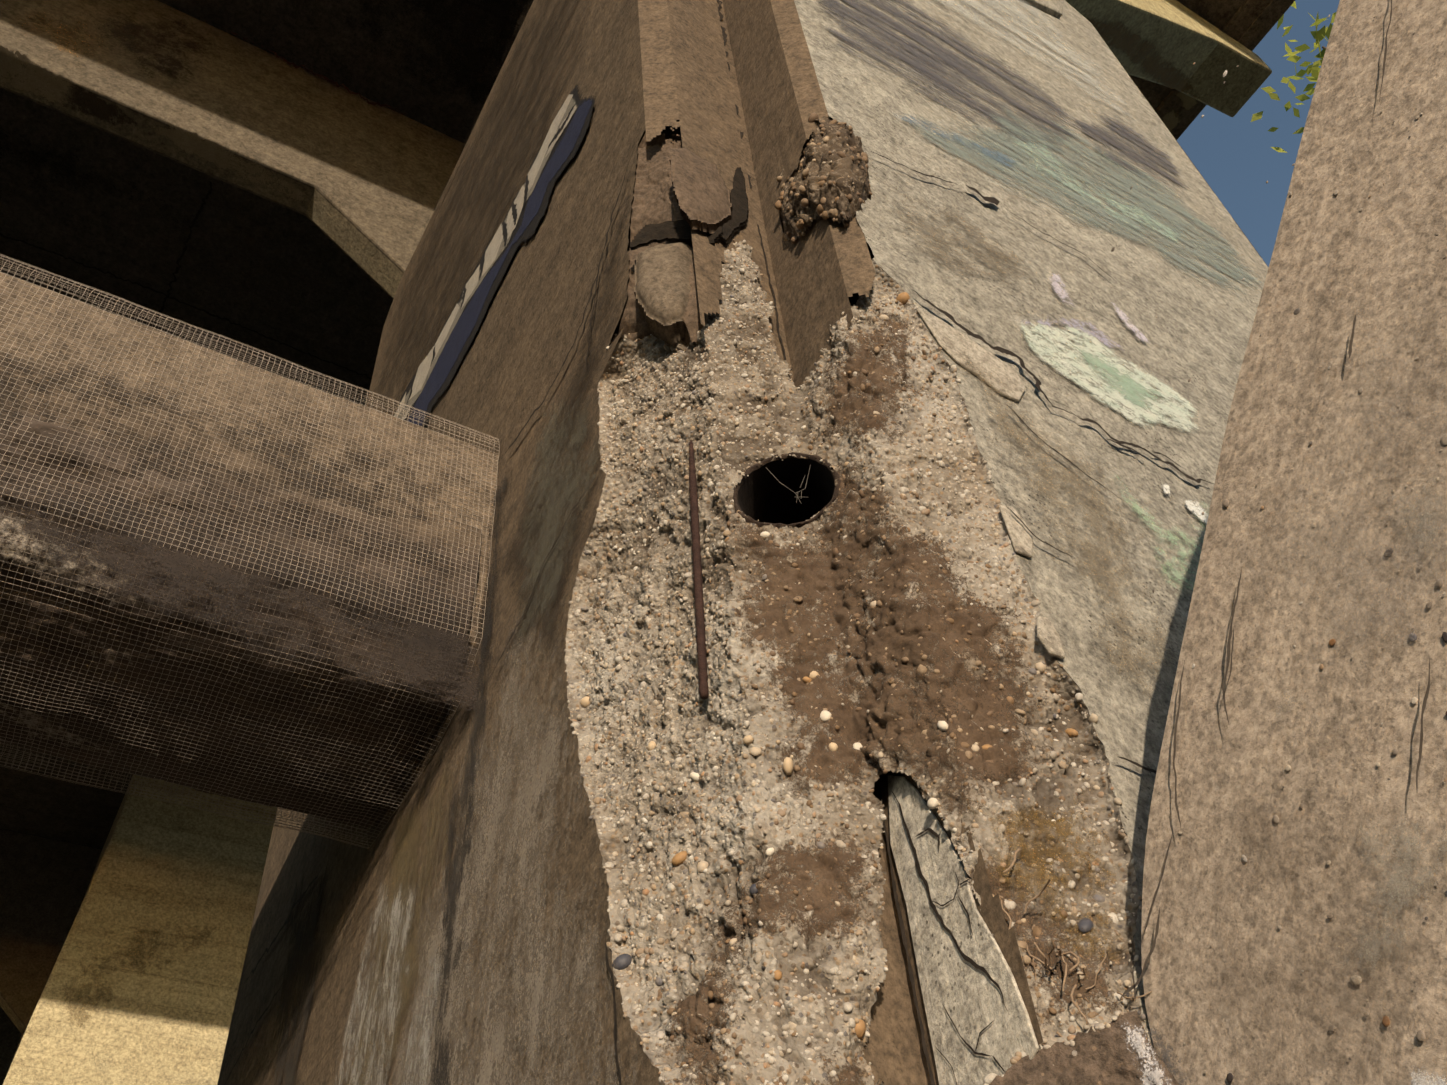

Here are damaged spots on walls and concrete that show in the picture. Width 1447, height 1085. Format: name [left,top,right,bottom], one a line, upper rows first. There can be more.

crack [911,289,1214,500]
spalling [564,113,1155,1085]
leakage [723,305,1055,845]
crack [1011,510,1073,557]
crack [1416,658,1430,790]
crack [605,927,621,1085]
leakage [655,821,879,1085]
crack [892,792,1010,1085]
leakage [969,802,1191,1085]